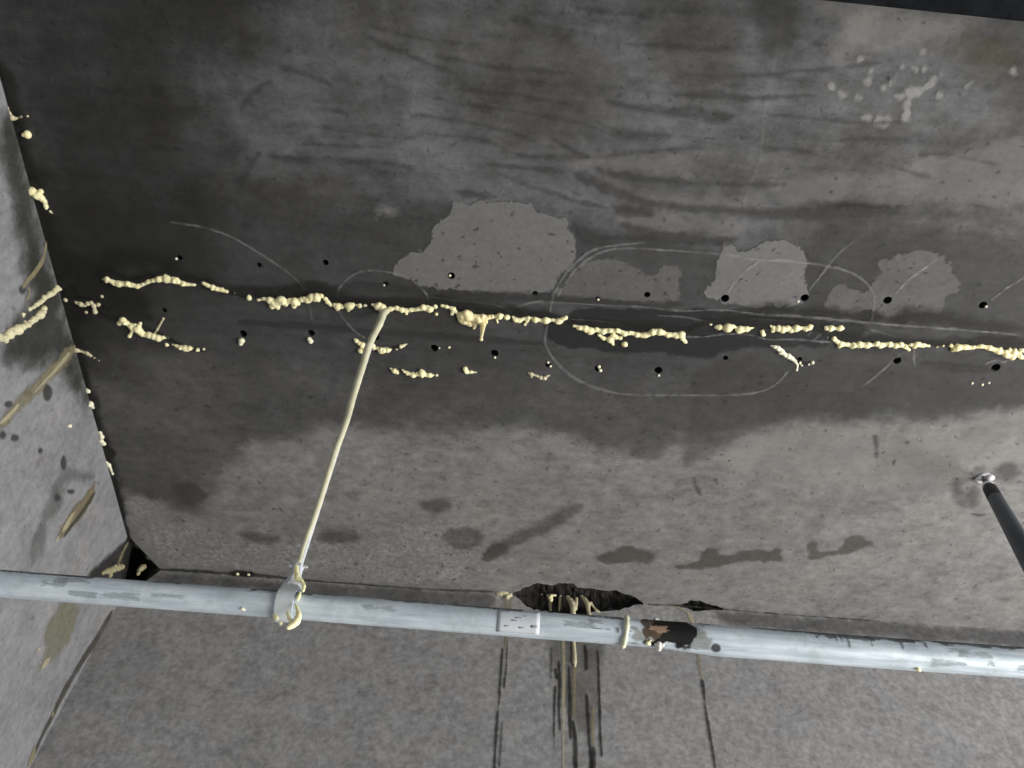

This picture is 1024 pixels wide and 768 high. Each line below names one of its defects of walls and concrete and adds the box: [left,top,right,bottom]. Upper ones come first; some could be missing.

crack [0,64,1024,548]
damp [220,198,1024,420]
damp [483,535,526,562]
damp [599,547,654,564]
damp [677,548,782,569]
damp [808,536,873,559]
spalling [513,583,643,615]
damp [493,636,508,768]
damp [550,641,603,768]